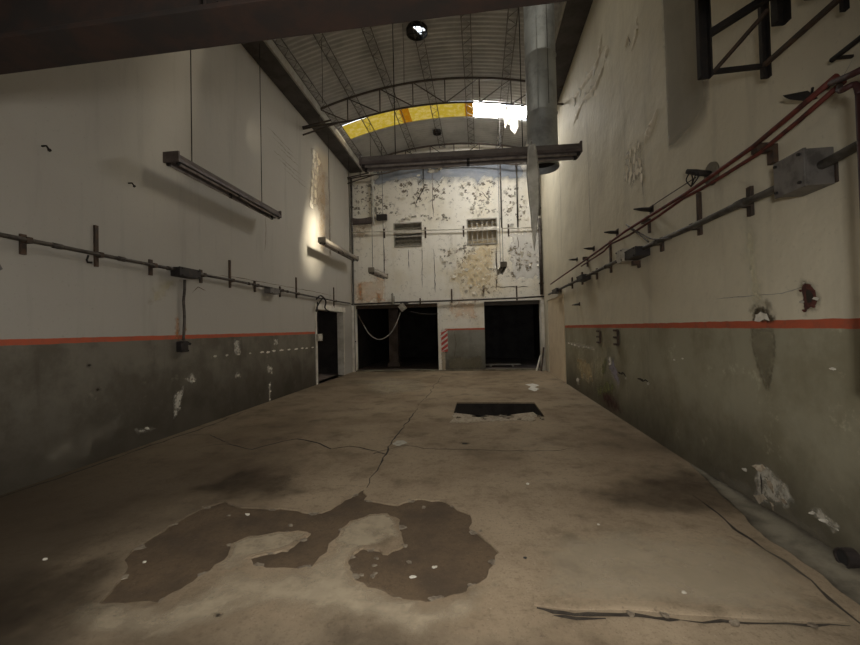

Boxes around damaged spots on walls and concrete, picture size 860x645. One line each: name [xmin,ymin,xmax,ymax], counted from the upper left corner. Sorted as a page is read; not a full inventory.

peeling [354,168,529,227]
peeling [440,245,498,297]
peeling [509,243,539,278]
crack [202,378,473,487]
peeling [742,464,790,510]
spalling [91,490,497,606]
crack [529,495,860,629]